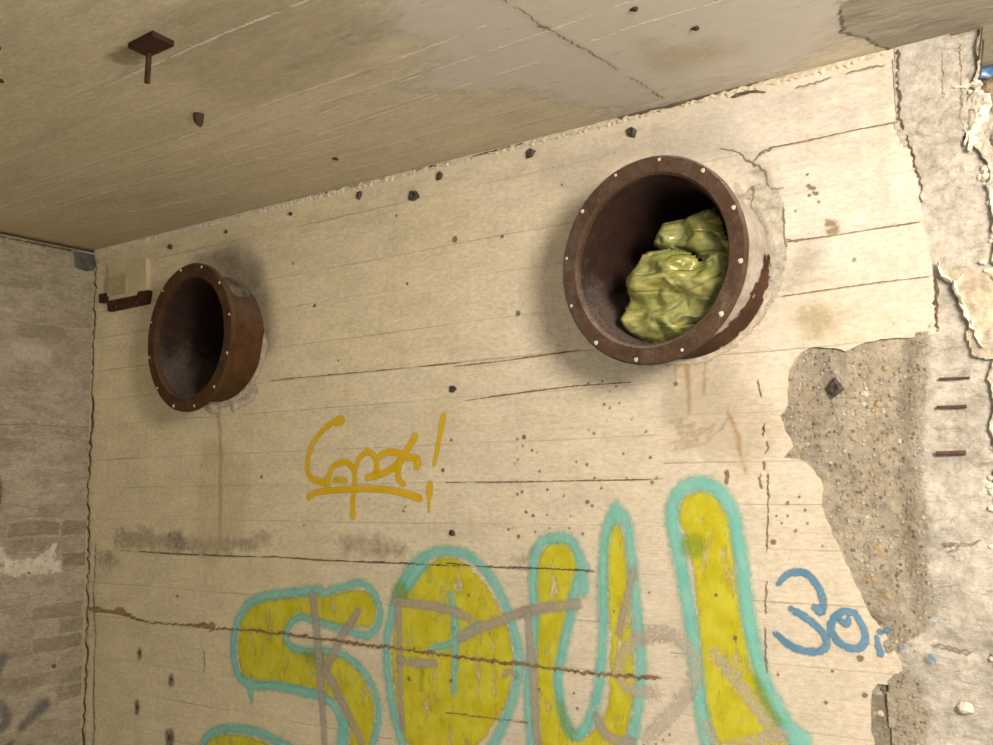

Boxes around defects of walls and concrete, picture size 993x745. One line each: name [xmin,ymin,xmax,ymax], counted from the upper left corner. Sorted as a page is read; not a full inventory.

crack [503,0,769,119]
crack [474,143,523,156]
crack [720,49,923,249]
crack [0,235,73,251]
corrosion [680,253,771,377]
spalling [781,0,993,745]
crack [0,261,661,745]